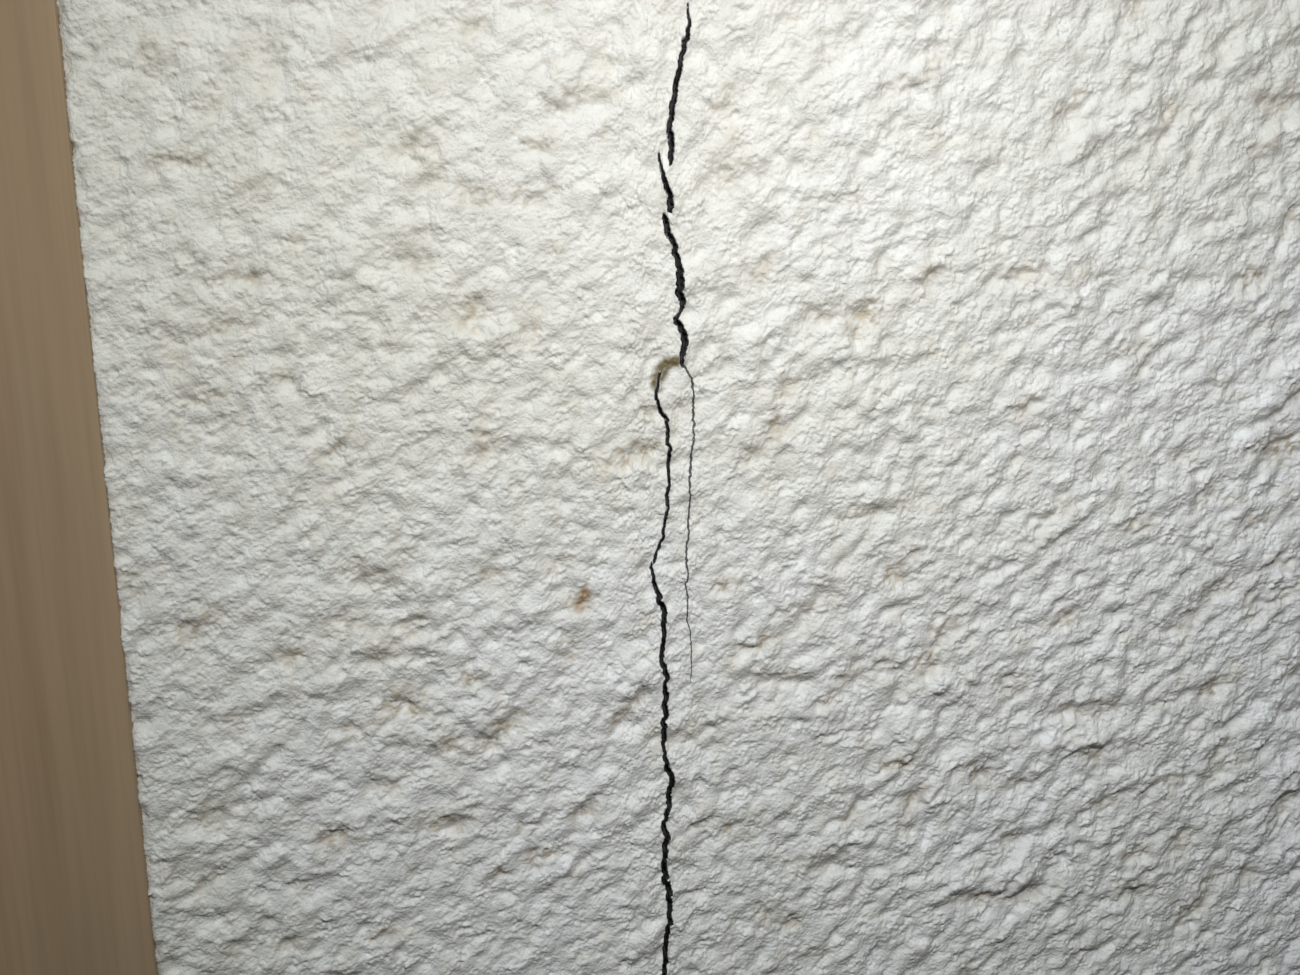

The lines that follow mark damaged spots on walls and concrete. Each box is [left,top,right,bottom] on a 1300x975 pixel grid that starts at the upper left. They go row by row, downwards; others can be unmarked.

crack [650,0,696,975]